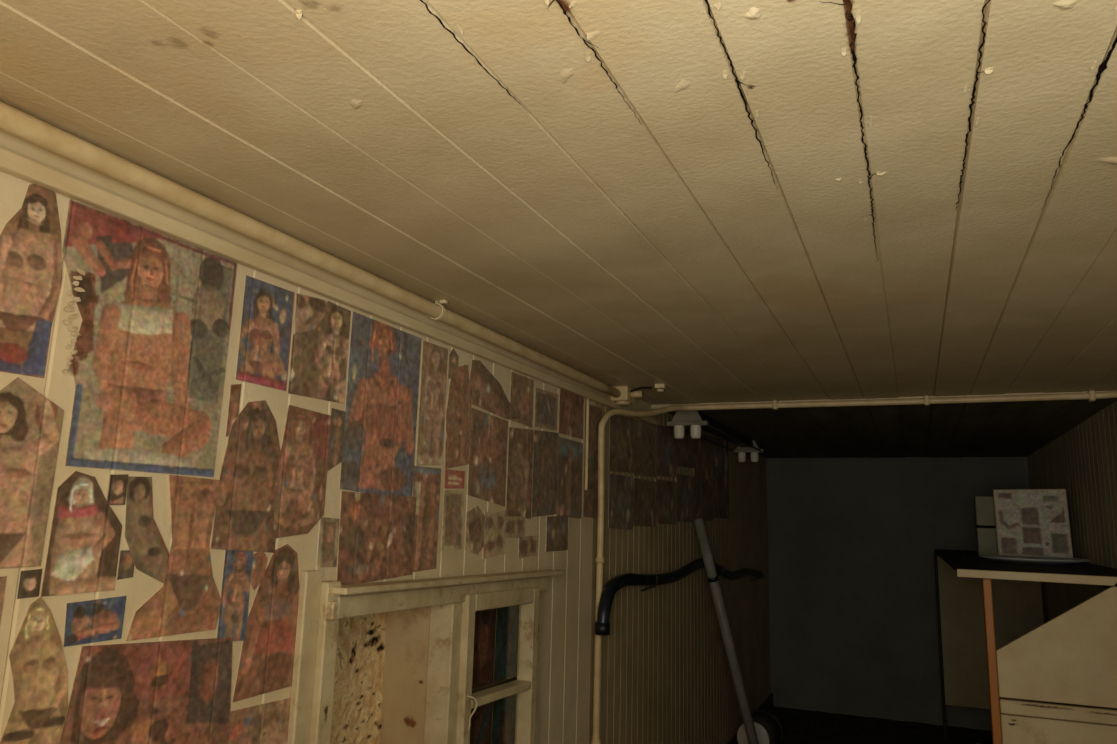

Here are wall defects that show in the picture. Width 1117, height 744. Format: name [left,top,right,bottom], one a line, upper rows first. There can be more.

crack [420,0,529,114]
crack [547,0,644,126]
crack [705,0,775,183]
corrosion [844,0,855,48]
crack [819,0,886,261]
crack [956,0,994,210]
crack [1044,3,1117,207]